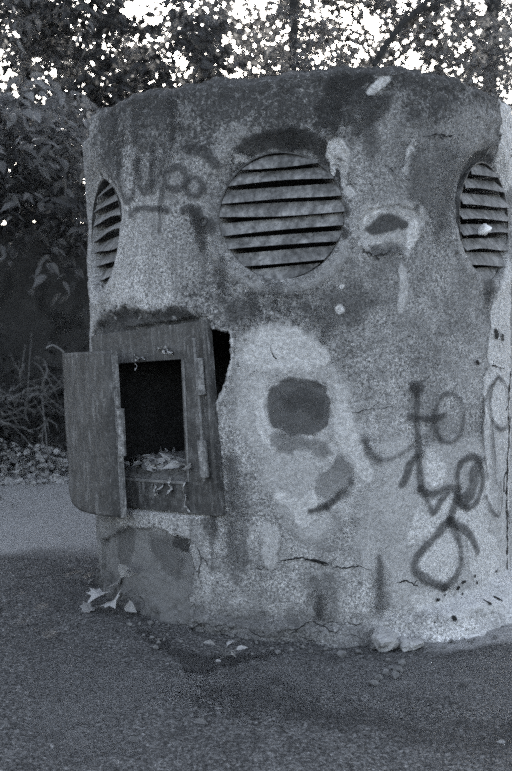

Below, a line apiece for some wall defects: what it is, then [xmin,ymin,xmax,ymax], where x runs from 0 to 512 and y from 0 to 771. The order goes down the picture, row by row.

spalling [366,74,395,96]
leakage [268,377,330,436]
crack [255,556,369,570]